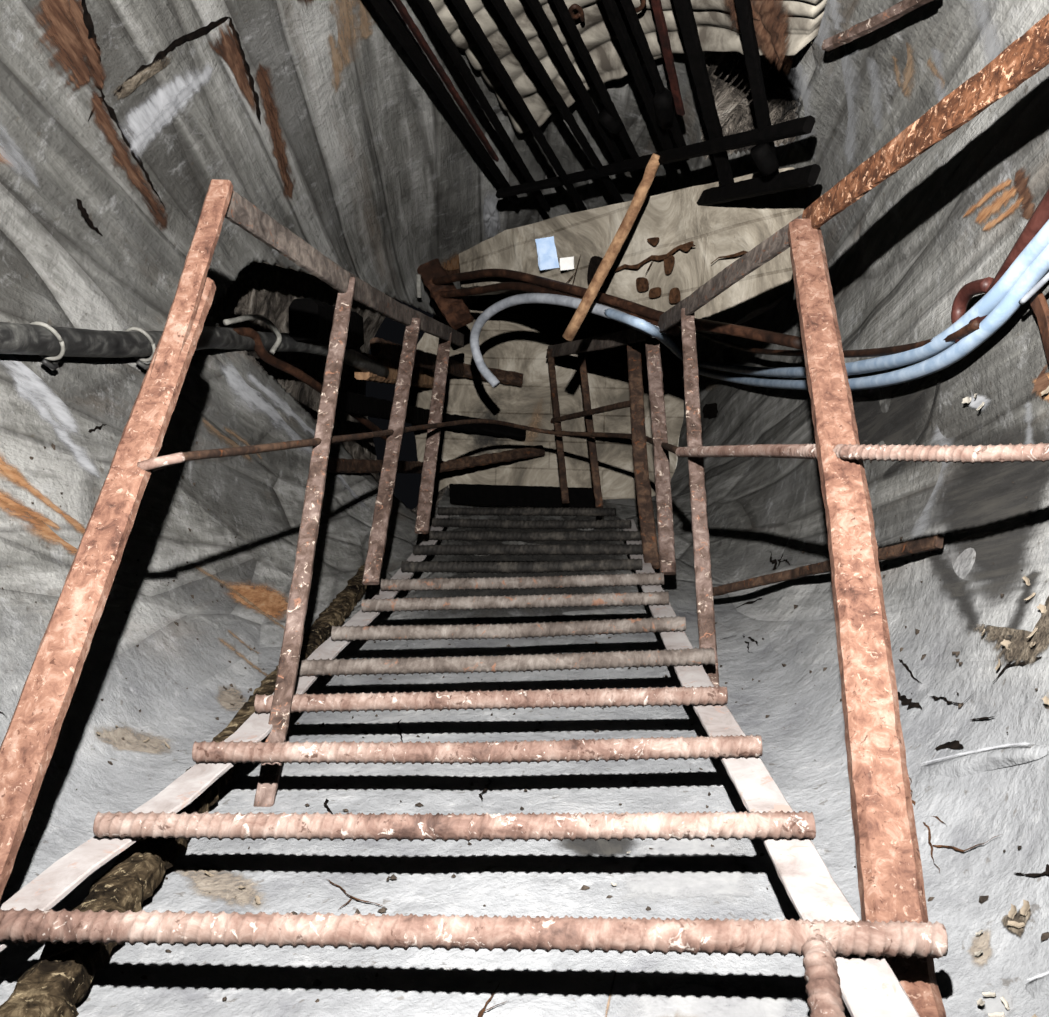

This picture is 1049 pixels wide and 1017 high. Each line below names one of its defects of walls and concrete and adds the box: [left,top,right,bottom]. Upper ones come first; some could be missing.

rust [329,0,372,90]
crack [81,0,166,209]
rust [255,64,294,199]
crack [76,199,103,236]
rust [963,169,1035,230]
rust [1033,365,1049,400]
rust [0,456,85,554]
rust [192,564,288,629]
spalling [973,575,1049,670]
spalling [1002,899,1031,936]